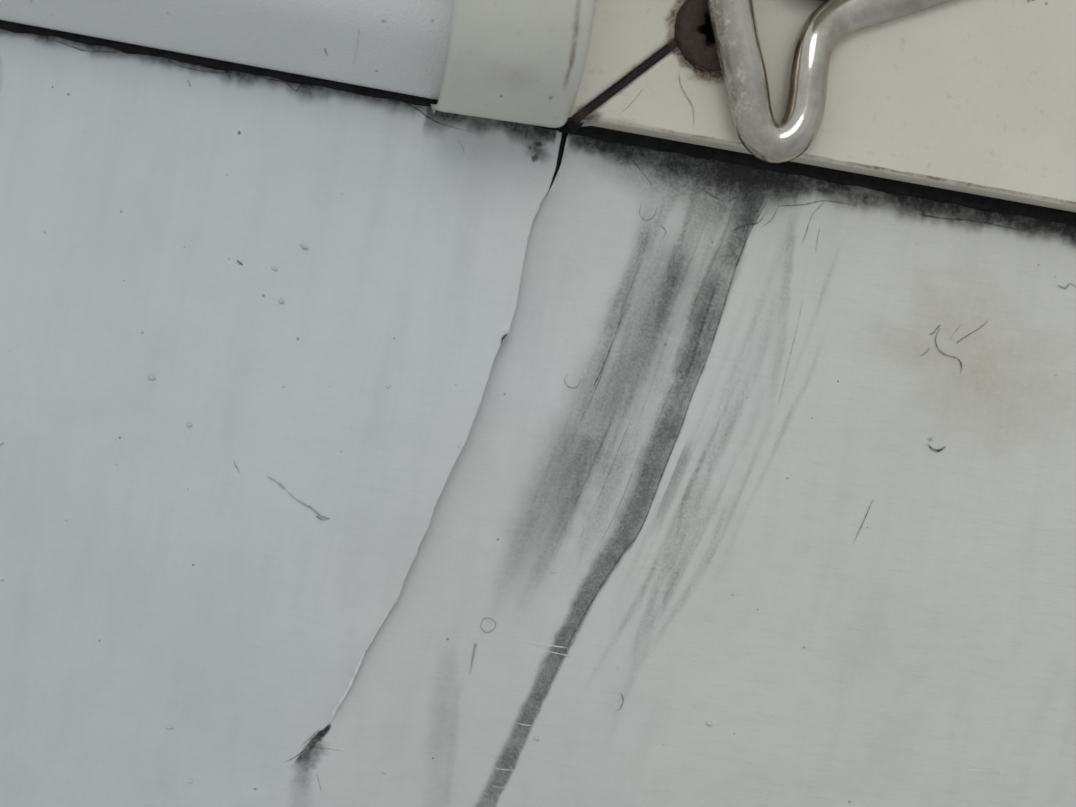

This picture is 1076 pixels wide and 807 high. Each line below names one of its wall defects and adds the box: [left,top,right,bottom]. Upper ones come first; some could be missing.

crack [288,133,569,761]
water stain [730,200,761,256]